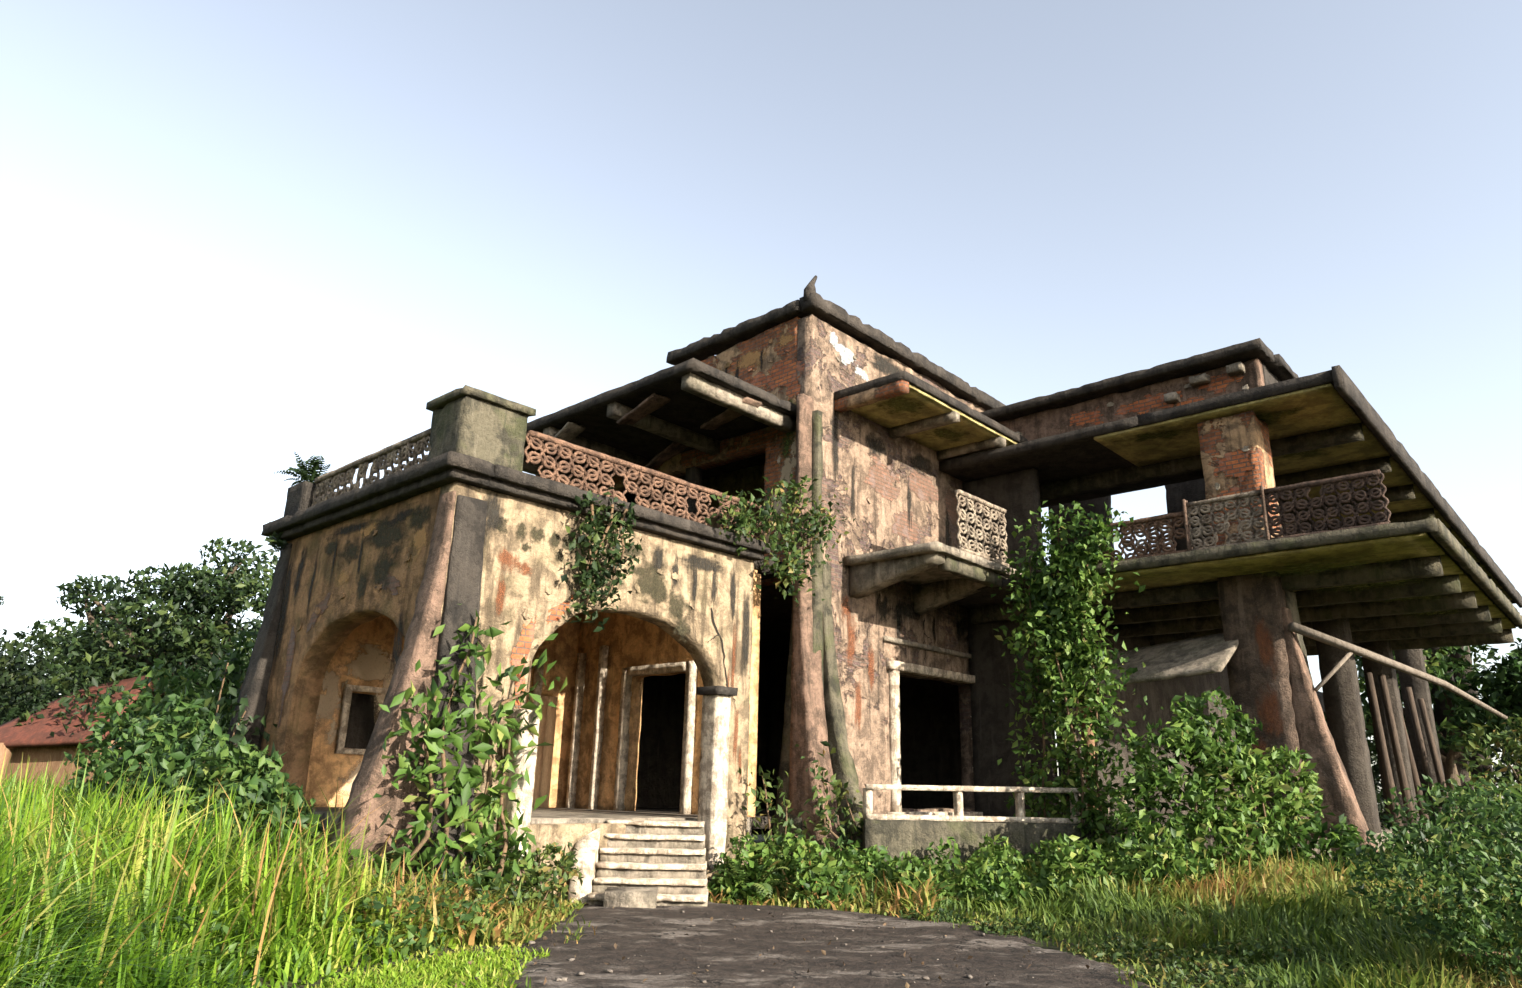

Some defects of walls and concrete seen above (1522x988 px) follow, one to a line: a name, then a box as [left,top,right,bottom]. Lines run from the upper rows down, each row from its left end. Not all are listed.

flaking render [719,335,805,400]
flaking render [1069,374,1249,427]
leakage [483,493,578,561]
leakage [258,504,432,753]
leakage [653,547,750,691]